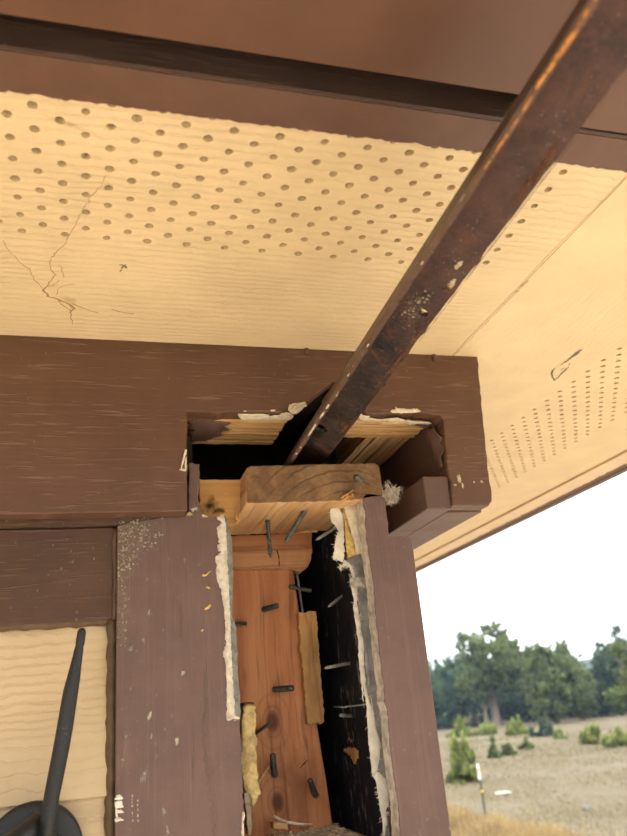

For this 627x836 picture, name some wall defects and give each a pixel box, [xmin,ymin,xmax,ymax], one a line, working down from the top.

corrosion [474,0,593,184]
crack [4,175,131,324]
peeling [238,402,307,420]
peeling [358,407,432,425]
peeling [202,515,239,721]